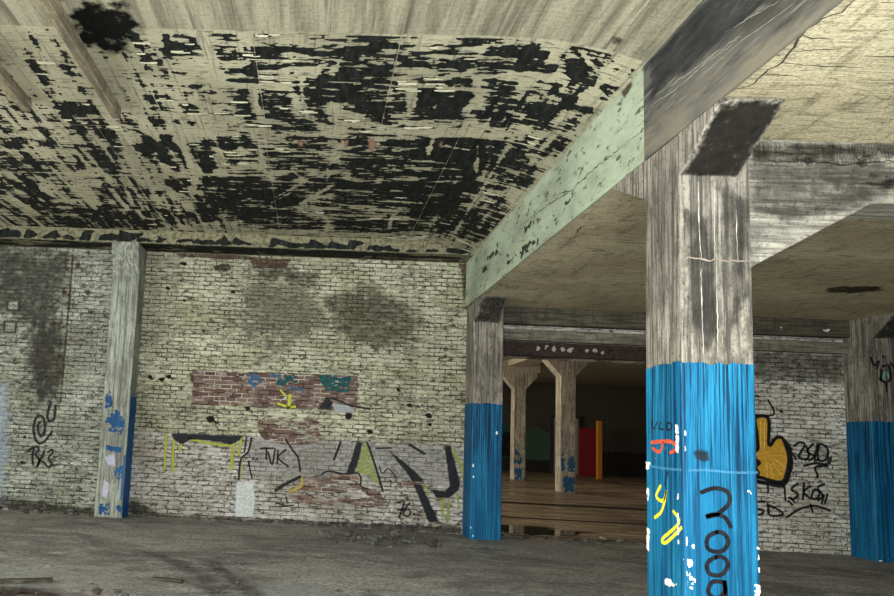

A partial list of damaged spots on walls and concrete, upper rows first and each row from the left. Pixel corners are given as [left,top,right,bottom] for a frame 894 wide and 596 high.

crack [735,0,894,90]
peeling [0,29,635,266]
water stain [684,101,894,322]
water stain [326,293,422,349]
water stain [685,213,719,349]
peeling [677,513,696,589]